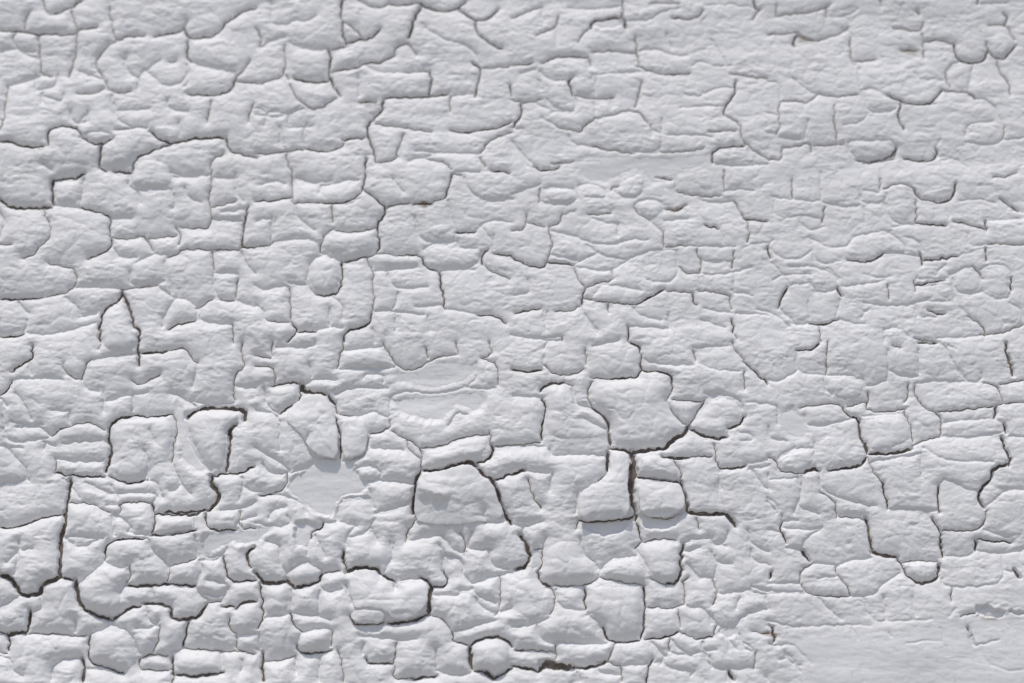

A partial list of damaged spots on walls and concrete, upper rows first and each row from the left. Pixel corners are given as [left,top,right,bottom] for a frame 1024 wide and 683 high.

crack [652,2,703,21]
crack [752,1,876,66]
crack [0,0,689,368]
crack [456,12,1024,390]
spalling [286,394,368,515]
crack [0,279,745,683]
crack [768,316,1024,646]
crack [728,627,776,680]
spalling [802,608,1024,683]